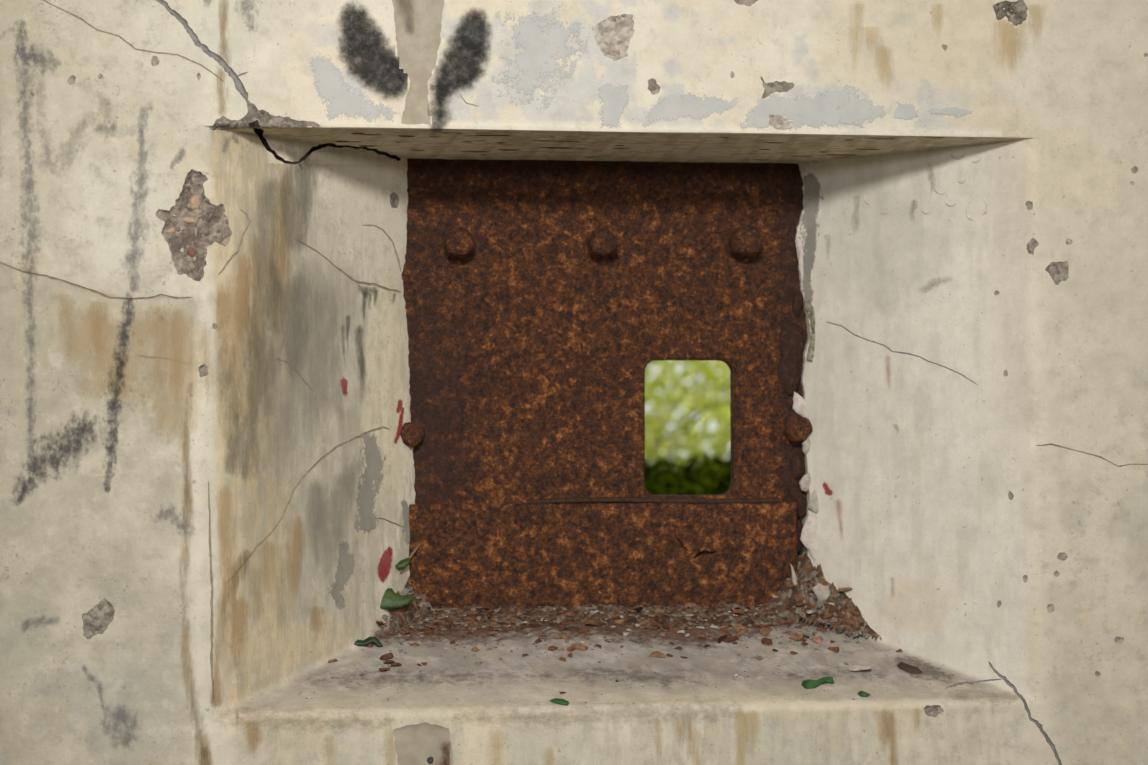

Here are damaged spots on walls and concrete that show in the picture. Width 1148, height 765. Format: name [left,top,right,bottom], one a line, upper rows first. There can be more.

crack [43,0,401,171]
peeling [492,6,634,109]
peeling [598,83,629,128]
spalling [155,169,232,282]
crack [0,262,193,300]
leakage [104,298,133,490]
leakage [347,325,364,377]
crack [827,322,978,385]
leakage [17,419,94,501]
leakage [220,491,246,641]
crack [208,427,390,699]
crack [946,661,1062,765]